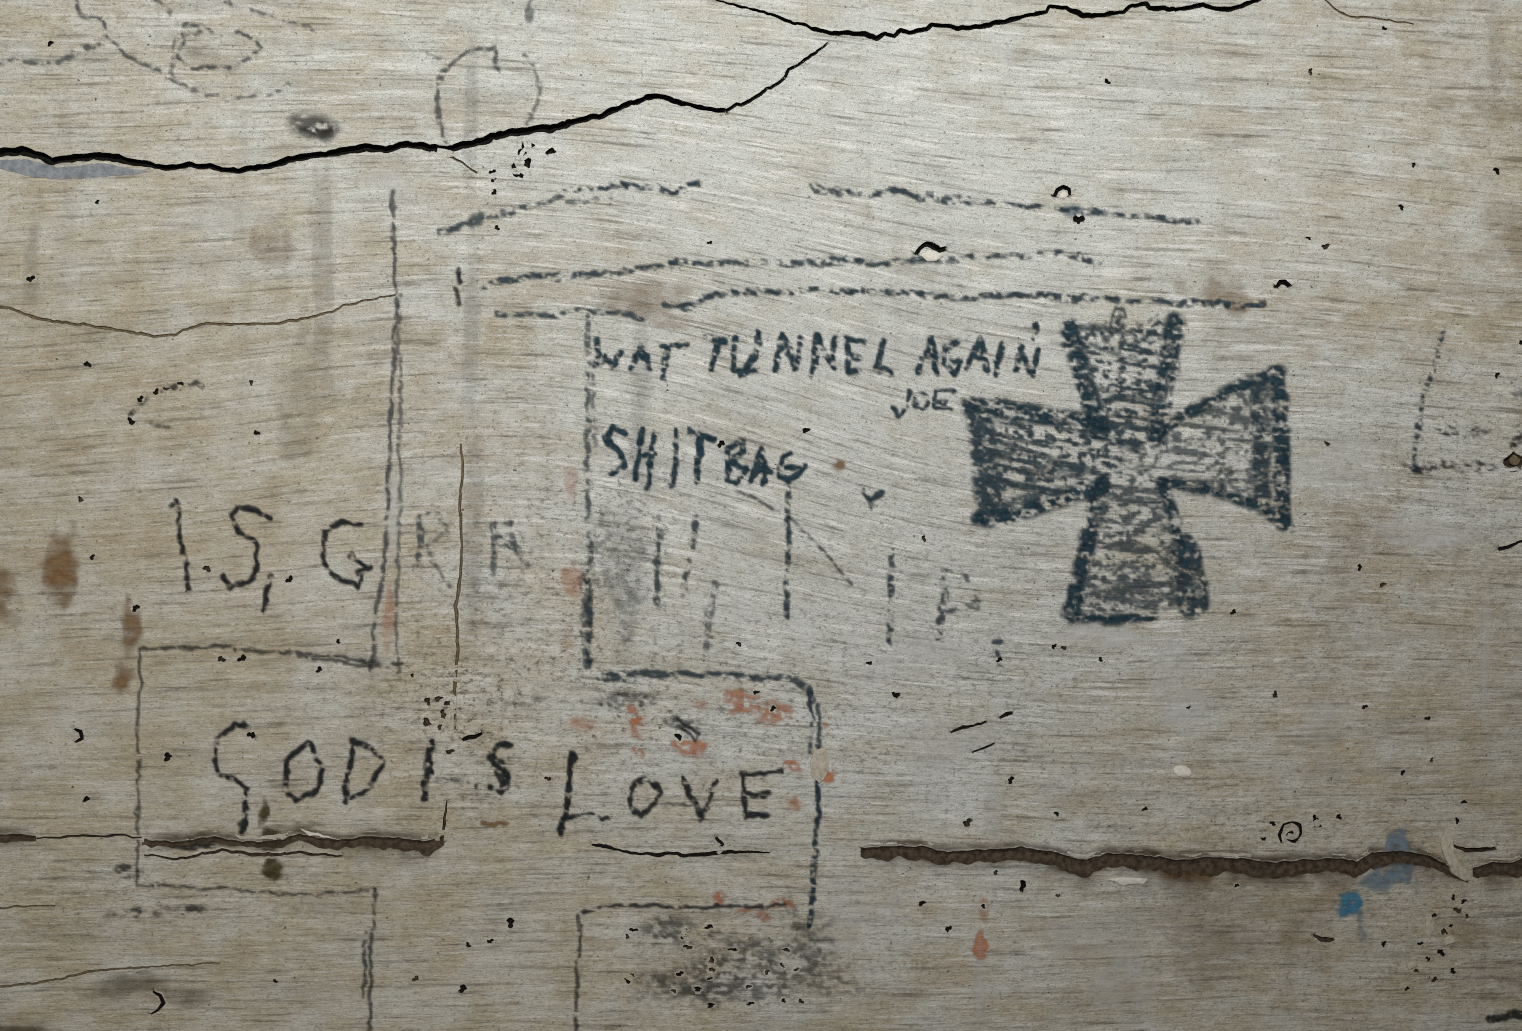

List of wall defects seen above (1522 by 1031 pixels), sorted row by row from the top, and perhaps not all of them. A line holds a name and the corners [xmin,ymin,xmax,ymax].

crack [0,0,1271,180]
crack [1319,0,1415,28]